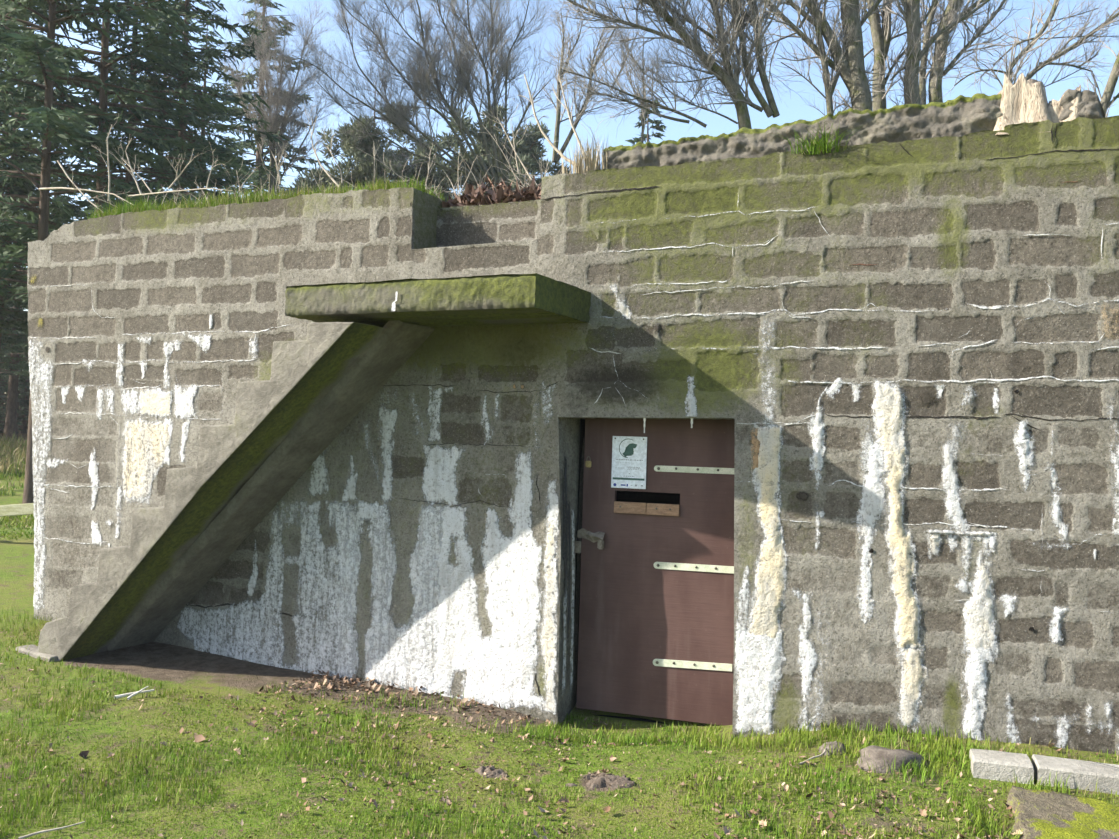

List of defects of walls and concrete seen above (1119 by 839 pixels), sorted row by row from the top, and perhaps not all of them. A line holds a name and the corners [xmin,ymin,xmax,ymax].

crack [603,201,828,255]
crack [602,280,942,320]
crack [740,285,1119,425]
water stain [28,315,213,610]
water stain [808,407,826,490]
crack [829,480,1006,491]
crack [905,413,1119,434]
water stain [1013,421,1034,489]
water stain [177,383,575,714]
water stain [735,322,823,735]
water stain [857,380,1016,740]
crack [876,514,1102,591]